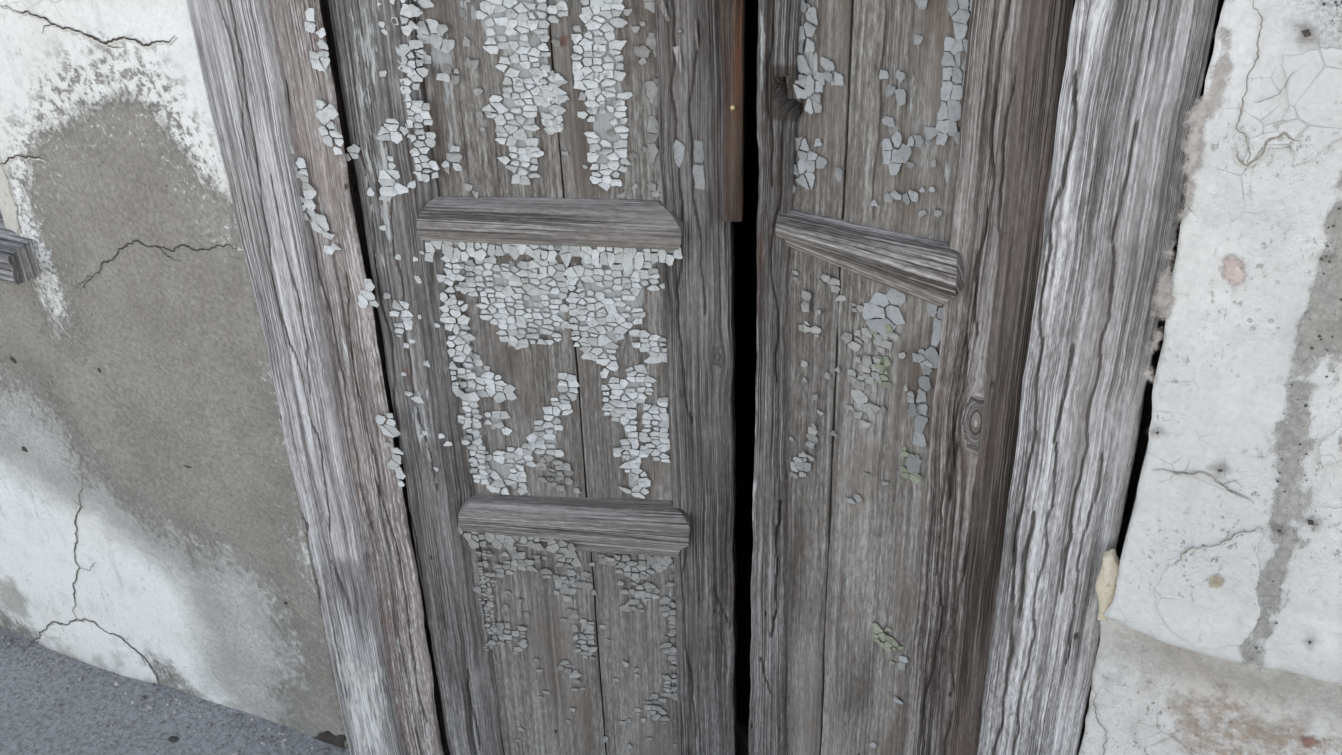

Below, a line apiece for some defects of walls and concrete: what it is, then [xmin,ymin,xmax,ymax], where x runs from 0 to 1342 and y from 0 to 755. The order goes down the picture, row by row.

crack [0,5,177,49]
flaking render [1178,28,1232,221]
crack [1233,0,1301,169]
peeling [1243,47,1342,167]
crack [0,155,47,236]
crack [74,240,238,290]
flaking render [1143,242,1174,381]
peeling [1223,254,1246,286]
leakage [1238,178,1342,670]
crack [34,476,172,684]
peeling [1153,528,1263,650]